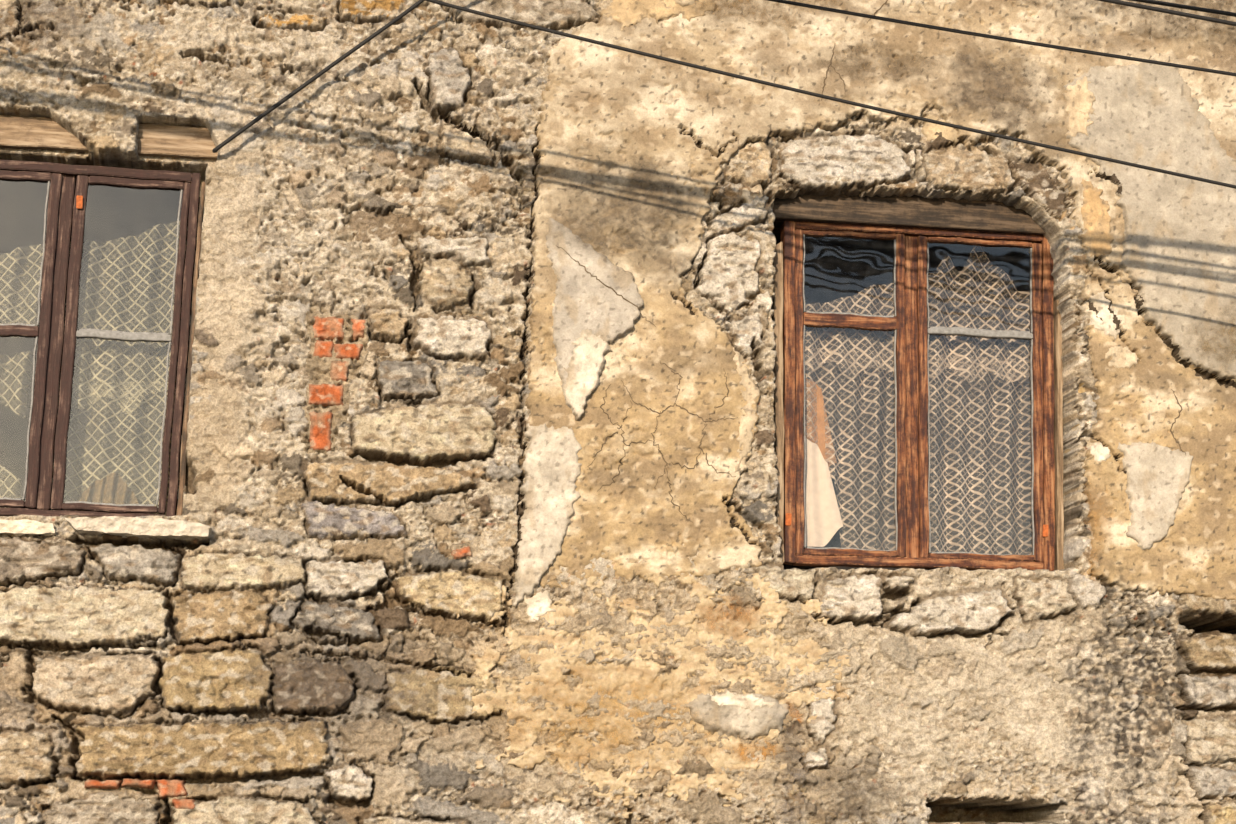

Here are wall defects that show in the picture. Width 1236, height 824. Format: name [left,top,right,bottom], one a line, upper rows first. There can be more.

spalling [599,0,716,31]
crack [681,129,737,158]
crack [440,115,656,635]
crack [587,362,757,545]
crack [672,294,695,315]
spalling [685,58,1236,583]